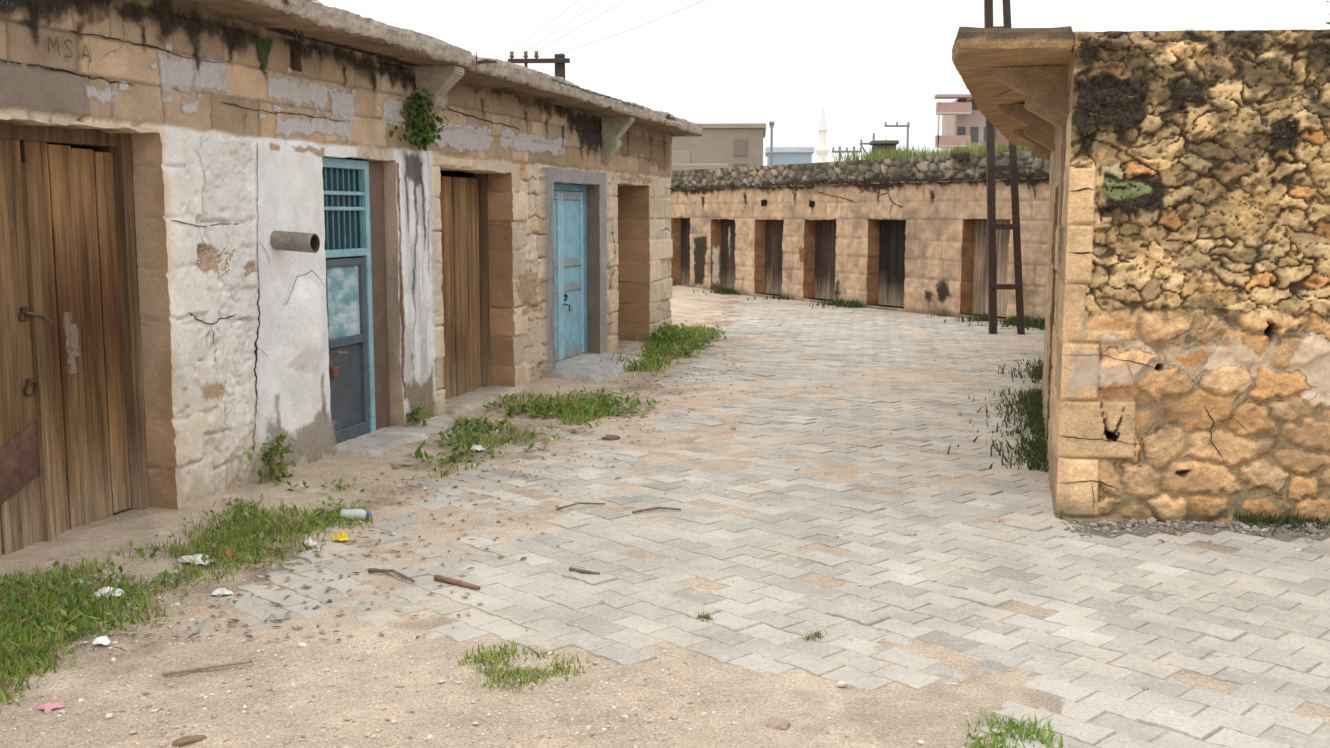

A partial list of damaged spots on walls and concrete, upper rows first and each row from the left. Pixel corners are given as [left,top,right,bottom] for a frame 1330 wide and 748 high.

water stain [0,0,39,43]
flaking render [1203,337,1268,378]
flaking render [1285,332,1330,413]